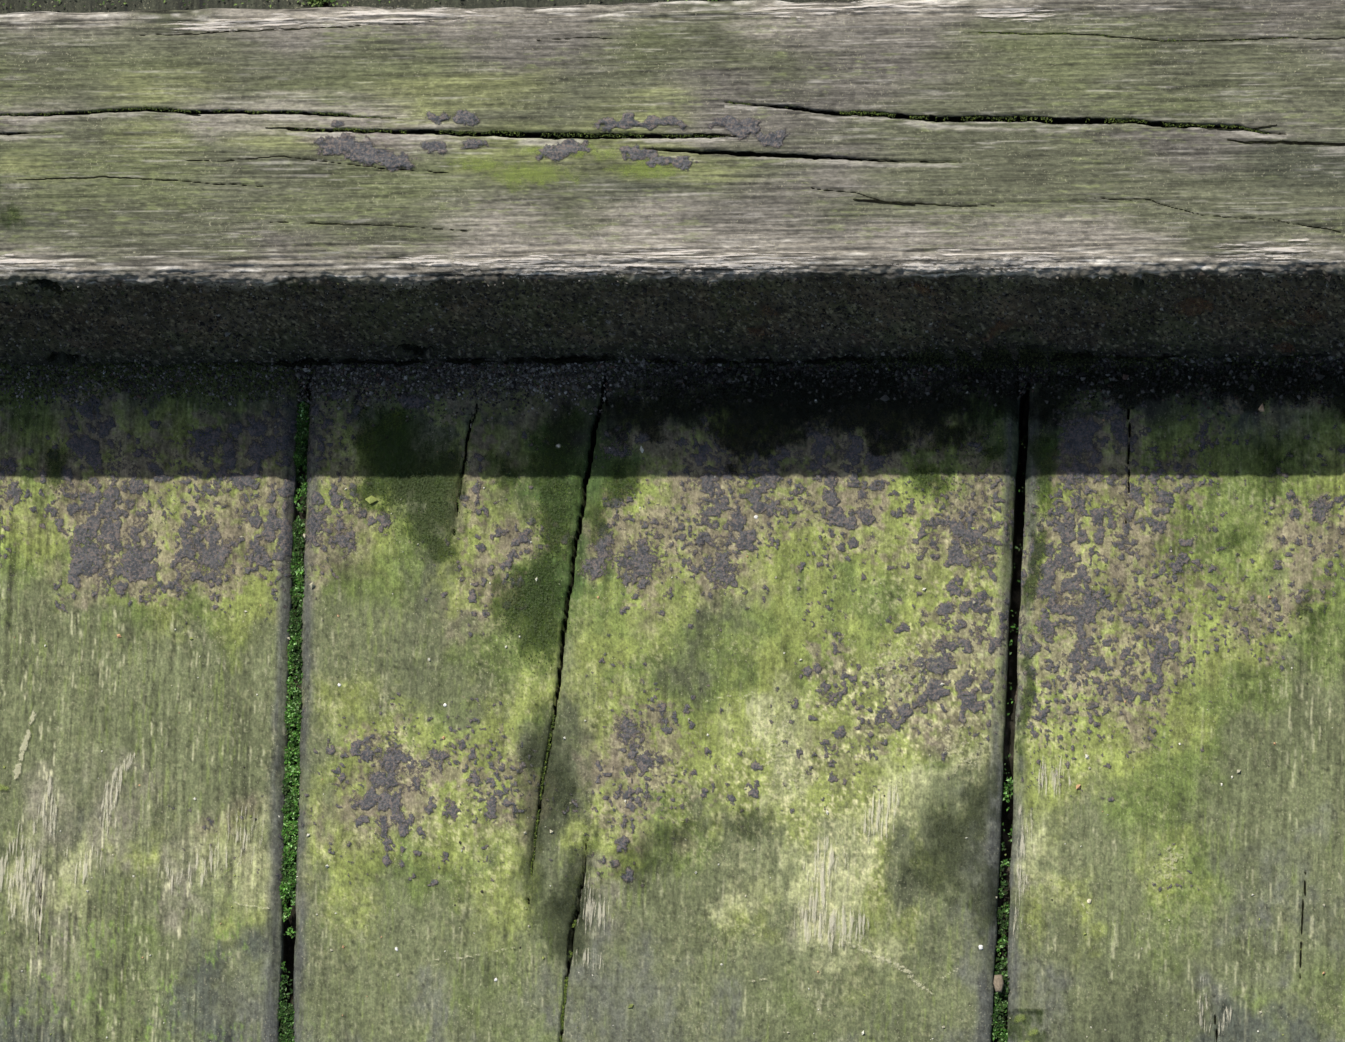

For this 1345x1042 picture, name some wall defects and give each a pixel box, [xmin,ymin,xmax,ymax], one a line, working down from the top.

crack [0,102,1345,207]
crack [650,357,923,366]
damp [600,356,1345,473]
crack [256,355,616,904]
crack [560,839,588,1040]